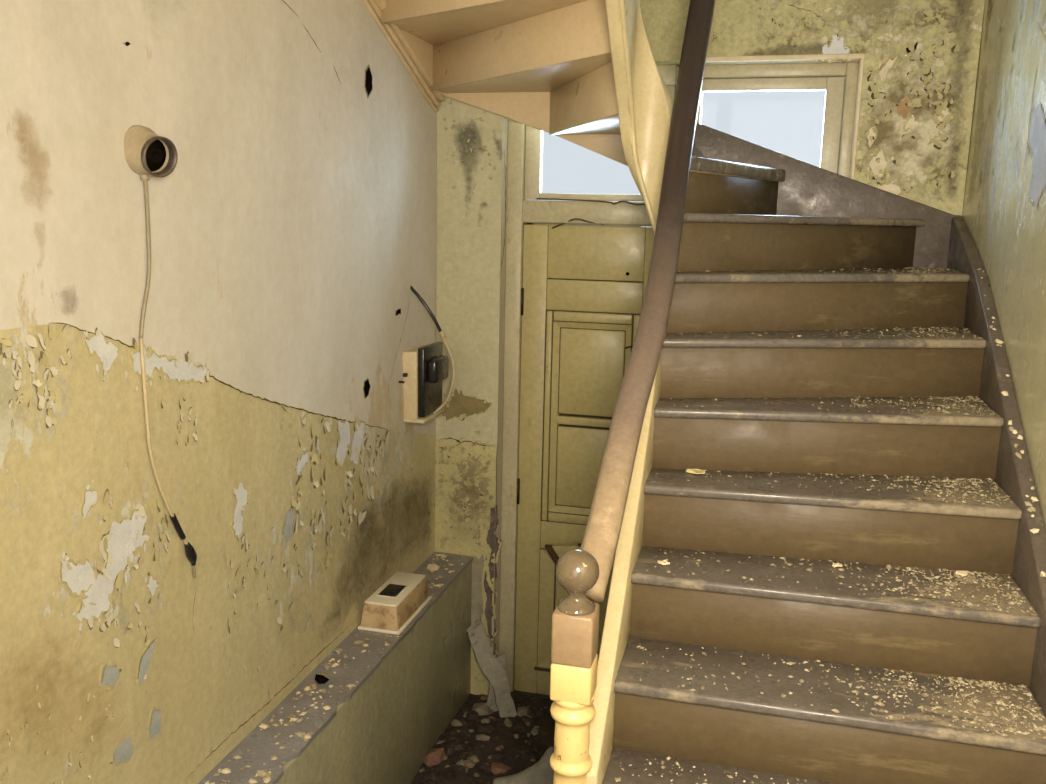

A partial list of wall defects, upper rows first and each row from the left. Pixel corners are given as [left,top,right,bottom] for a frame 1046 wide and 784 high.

peeling [818,34,852,63]
damp [458,125,480,180]
peeling [0,323,210,447]
spalling [363,378,371,399]
spalling [442,388,492,421]
peeling [228,408,389,637]
peeling [53,479,172,686]
peeling [87,663,122,717]
peeling [110,735,134,766]